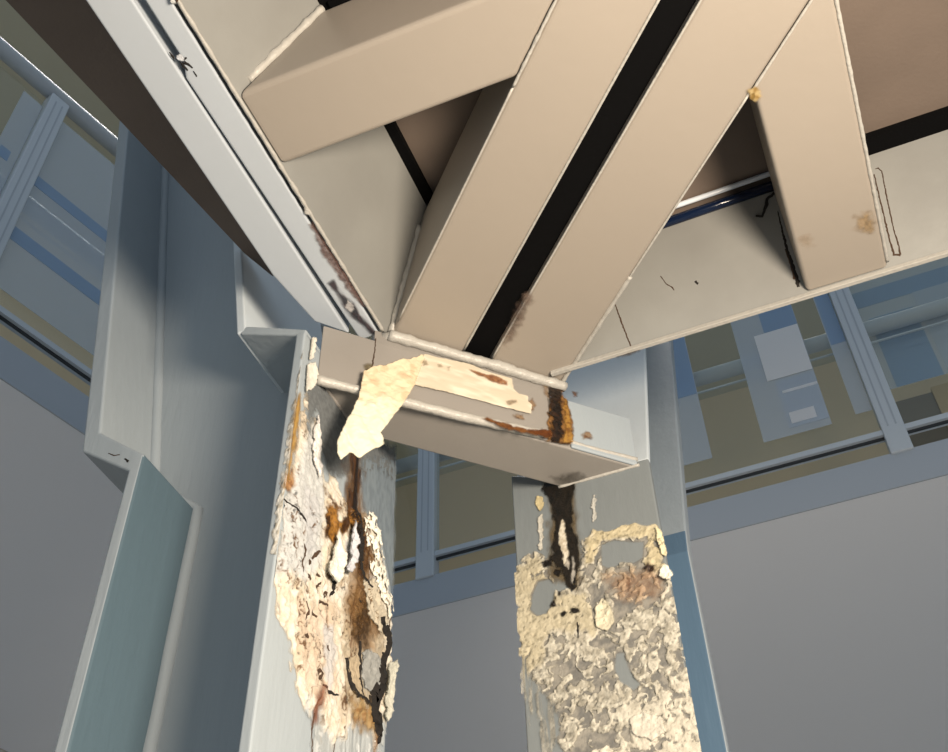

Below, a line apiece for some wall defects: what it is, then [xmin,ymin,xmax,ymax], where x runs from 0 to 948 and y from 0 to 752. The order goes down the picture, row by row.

rust [305,208,375,334]
crack [777,211,800,287]
crack [874,167,901,256]
rust [485,386,592,444]
peeling [270,337,399,752]
rust [325,453,379,646]
crack [284,499,393,744]
peeling [514,495,702,752]
crack [311,715,337,752]